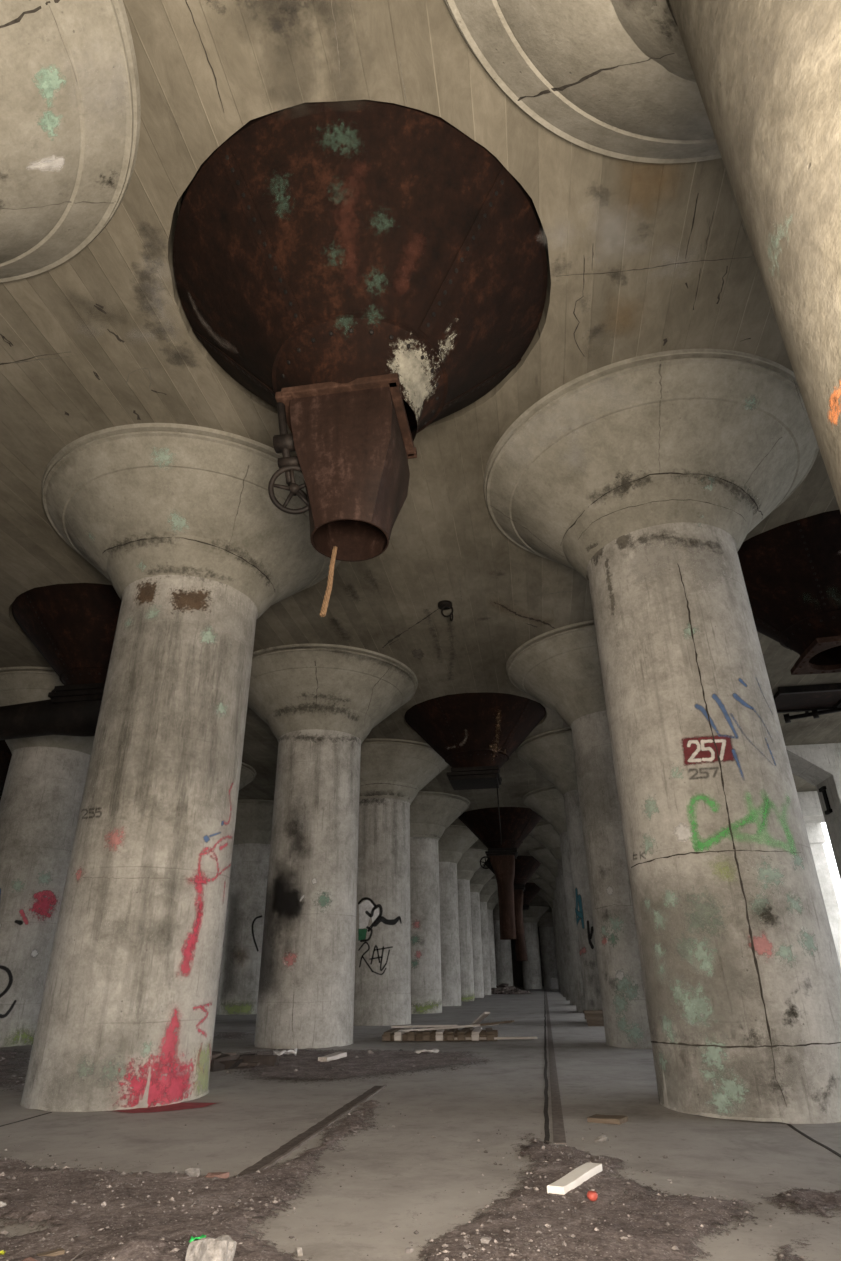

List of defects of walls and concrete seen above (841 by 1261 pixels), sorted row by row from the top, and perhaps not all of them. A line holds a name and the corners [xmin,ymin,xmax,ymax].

crack [0,0,78,85]
crack [517,53,675,101]
corrosion [136,578,157,605]
corrosion [171,589,211,613]
crack [631,563,841,1106]